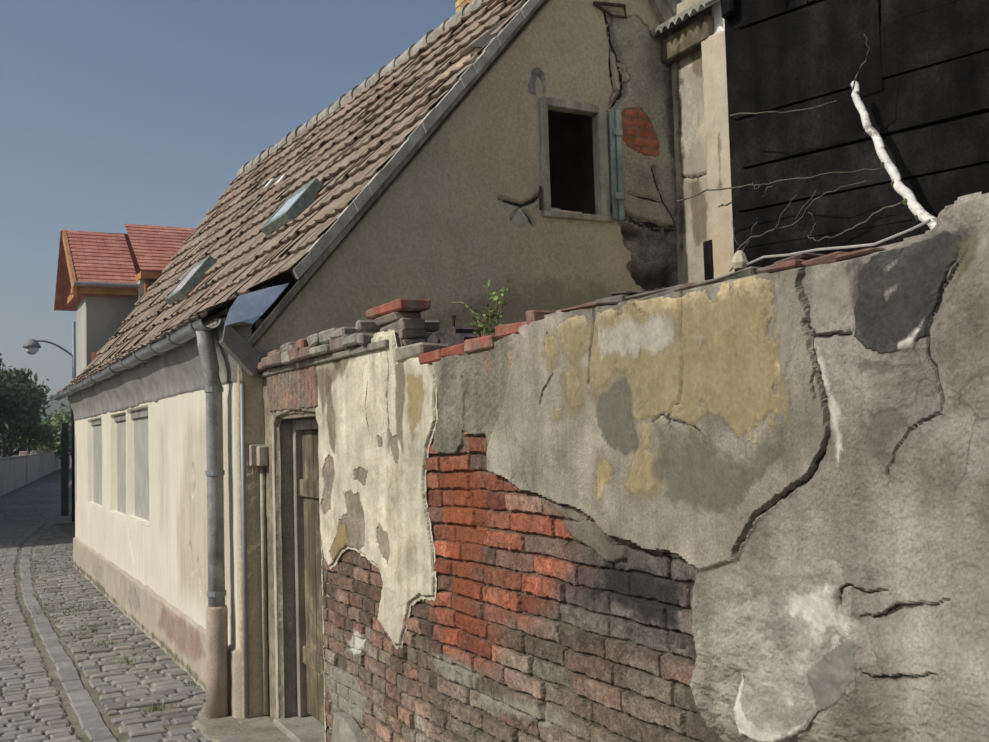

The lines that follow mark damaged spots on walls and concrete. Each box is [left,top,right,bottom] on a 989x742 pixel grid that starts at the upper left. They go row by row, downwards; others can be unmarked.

crack [603,12,623,108]
flaking render [621,107,659,157]
crack [498,196,538,224]
peeling [545,207,789,497]
crack [808,323,852,405]
crack [888,260,963,476]
spalling [316,329,877,742]
crack [743,445,828,542]
crack [839,584,949,618]